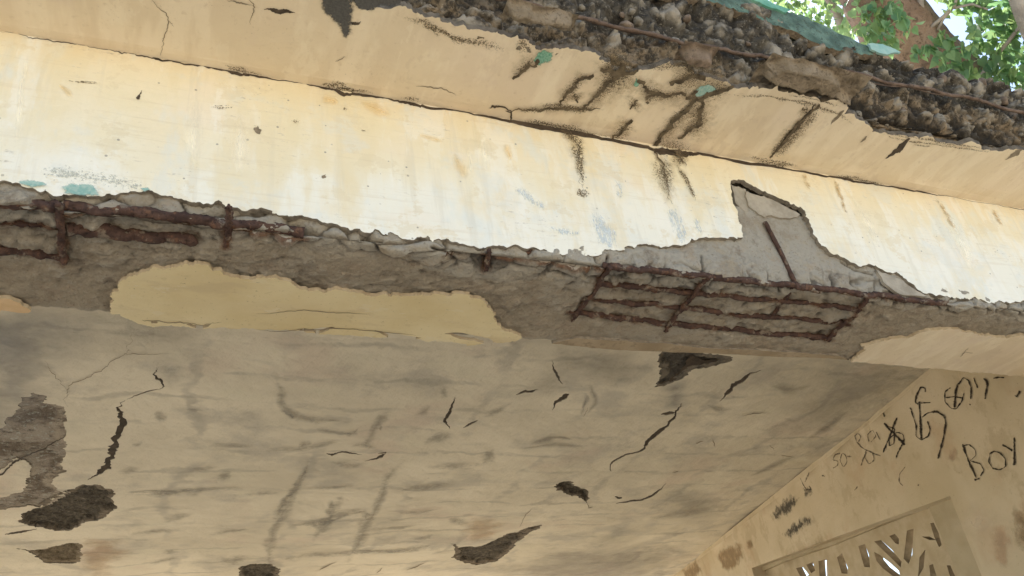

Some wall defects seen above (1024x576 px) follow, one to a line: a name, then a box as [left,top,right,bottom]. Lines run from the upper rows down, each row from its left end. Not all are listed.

leakage [413,19,500,49]
crack [9,0,1024,210]
leakage [512,49,844,203]
spalling [401,0,1024,148]
spalling [0,168,1024,386]
flaking render [0,392,117,530]
crack [91,405,127,478]
spalling [556,481,589,501]
crack [610,407,679,470]
crack [615,471,678,502]
spalling [453,525,540,564]